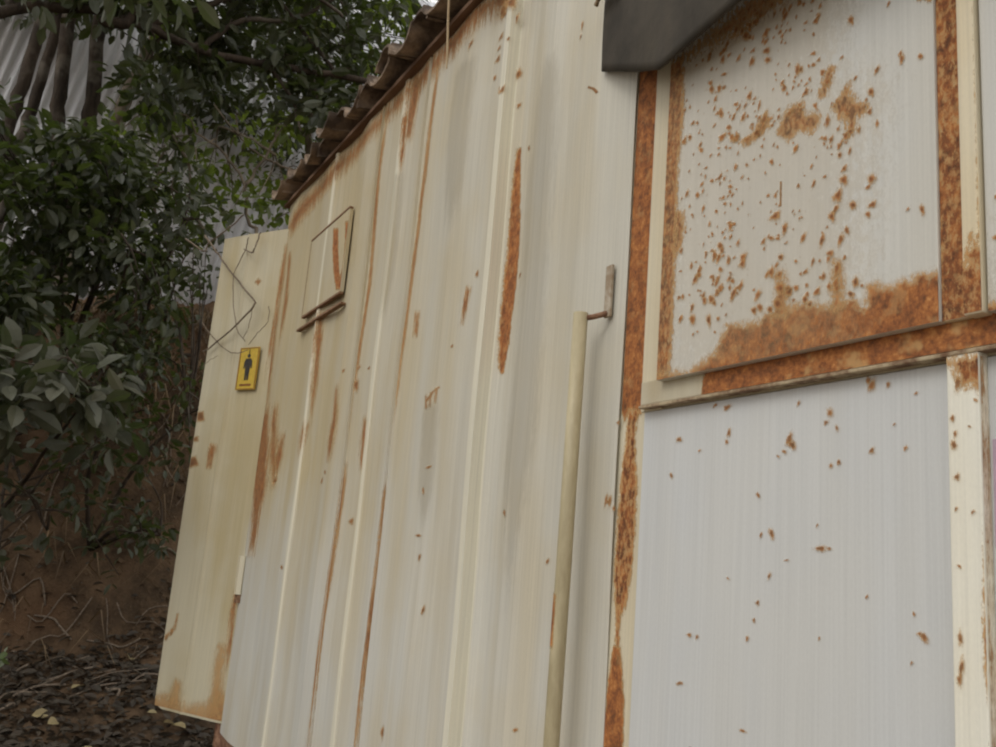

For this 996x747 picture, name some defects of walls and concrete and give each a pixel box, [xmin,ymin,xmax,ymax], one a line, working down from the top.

corrosion [288,0,520,411]
corrosion [498,146,530,374]
corrosion [248,246,291,552]
corrosion [321,388,337,482]
corrosion [358,419,366,468]
corrosion [604,70,658,747]
corrosion [968,424,991,482]
corrosion [155,648,224,721]
corrosion [309,470,353,728]
corrosion [354,486,386,747]
corrosion [981,540,994,700]